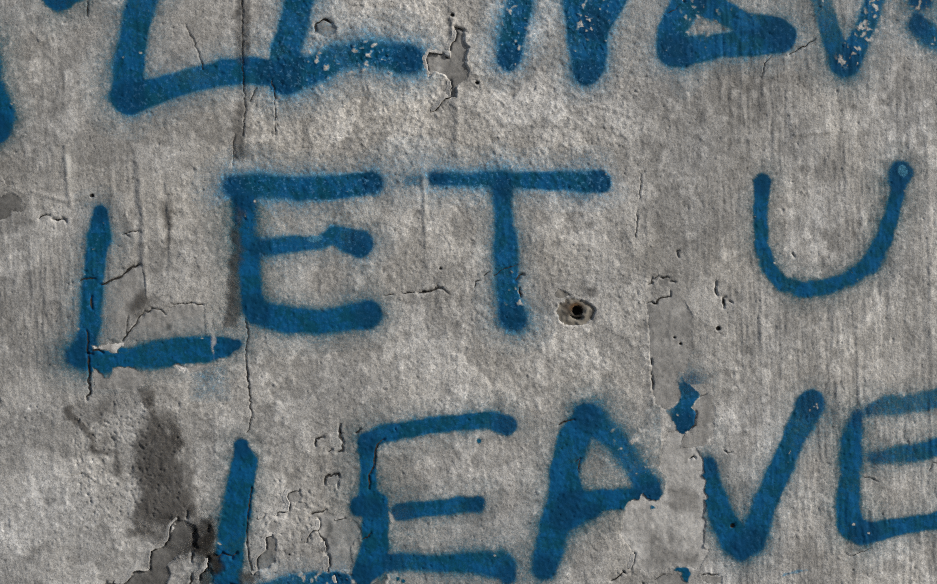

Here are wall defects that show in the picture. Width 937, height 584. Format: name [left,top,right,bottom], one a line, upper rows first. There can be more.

crack [233,0,278,161]
flaking render [422,14,479,112]
crack [79,264,139,308]
crack [84,330,92,397]
water stain [135,390,193,533]
flaking render [98,517,197,584]
flaking render [195,558,213,584]
water stain [193,524,223,574]